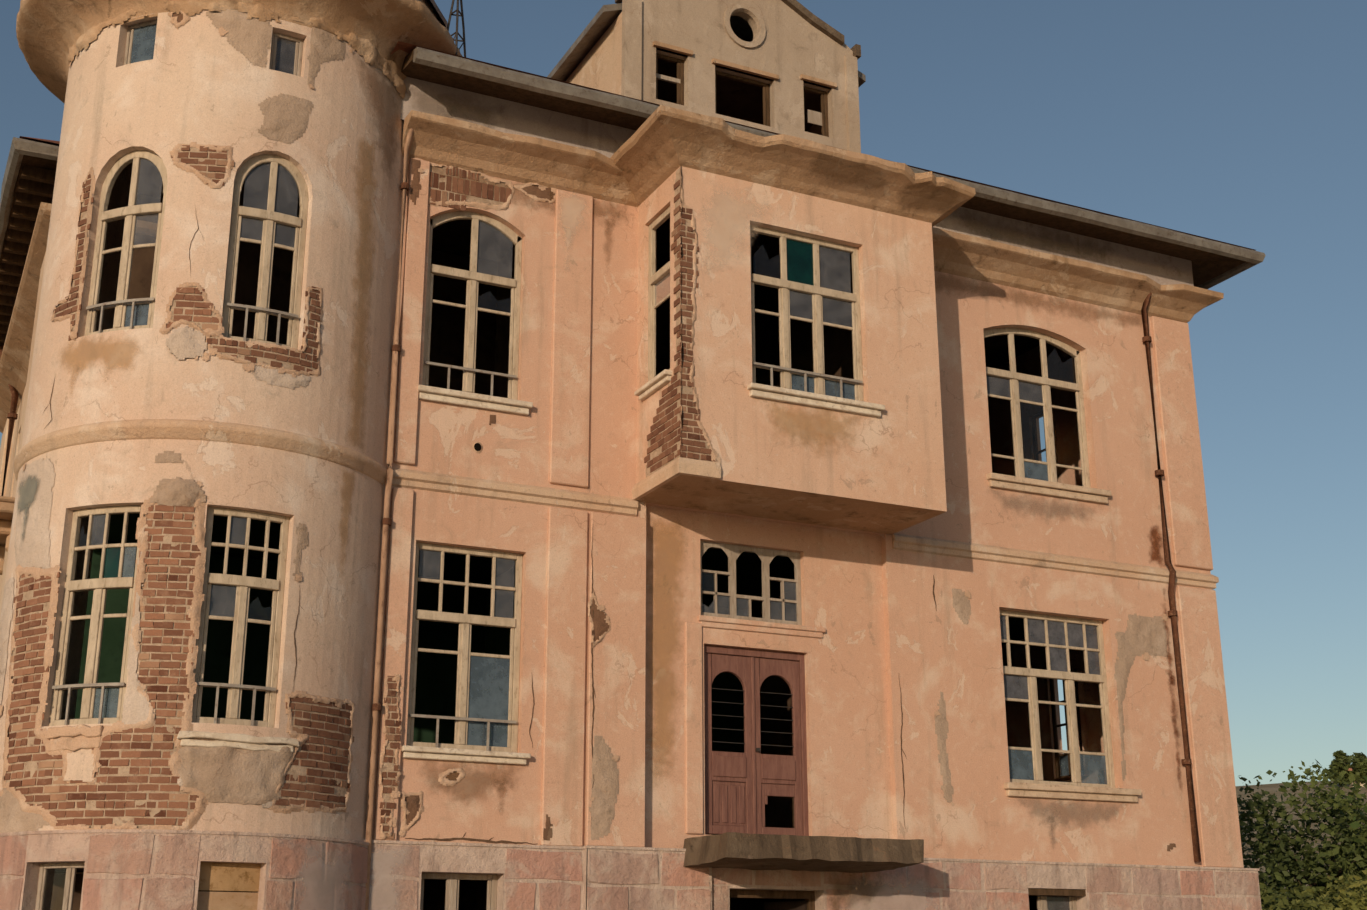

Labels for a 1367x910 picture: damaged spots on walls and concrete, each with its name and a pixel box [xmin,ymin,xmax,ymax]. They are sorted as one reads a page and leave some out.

flaking render [169,142,234,189]
flaking render [410,158,557,211]
flaking render [50,167,96,341]
flaking render [159,282,324,390]
flaking render [644,166,721,477]
spalling [293,523,309,582]
corrosion [1151,528,1161,562]
flaking render [0,458,209,830]
crack [293,591,304,689]
flaking render [262,690,355,814]
spalling [378,674,424,839]
spalling [438,768,466,787]